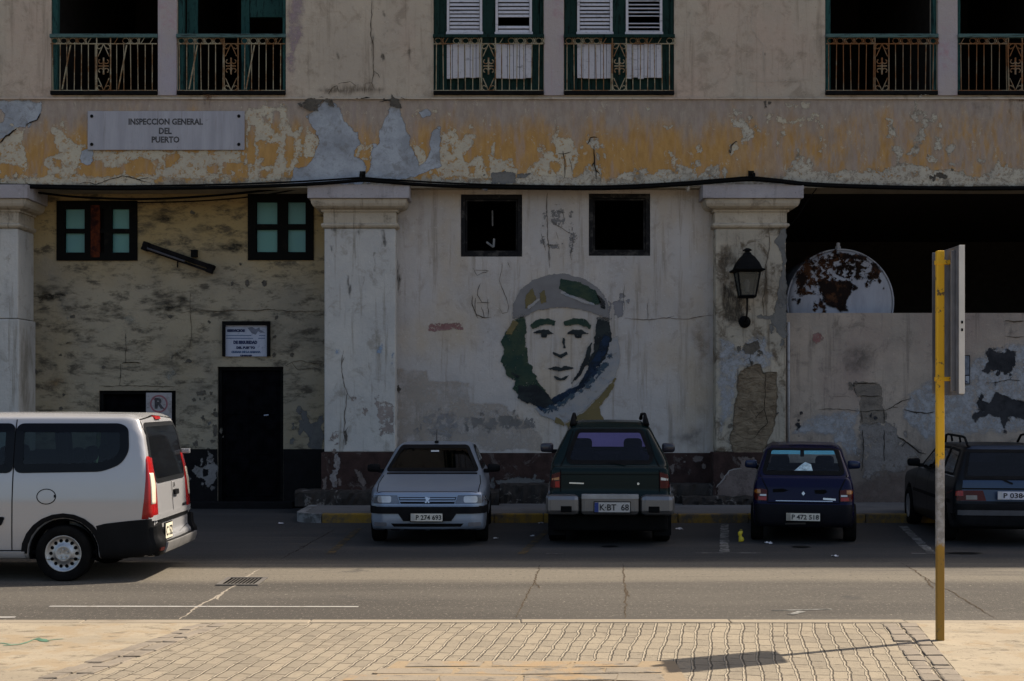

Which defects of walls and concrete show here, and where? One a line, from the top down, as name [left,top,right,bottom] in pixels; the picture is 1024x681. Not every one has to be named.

peeling [0,97,335,185]
peeling [412,124,728,192]
peeling [729,94,1024,192]
peeling [189,408,224,491]
crack [285,351,351,438]
flaking render [717,340,779,496]
flaking render [849,381,922,481]
flaking render [972,348,1024,433]